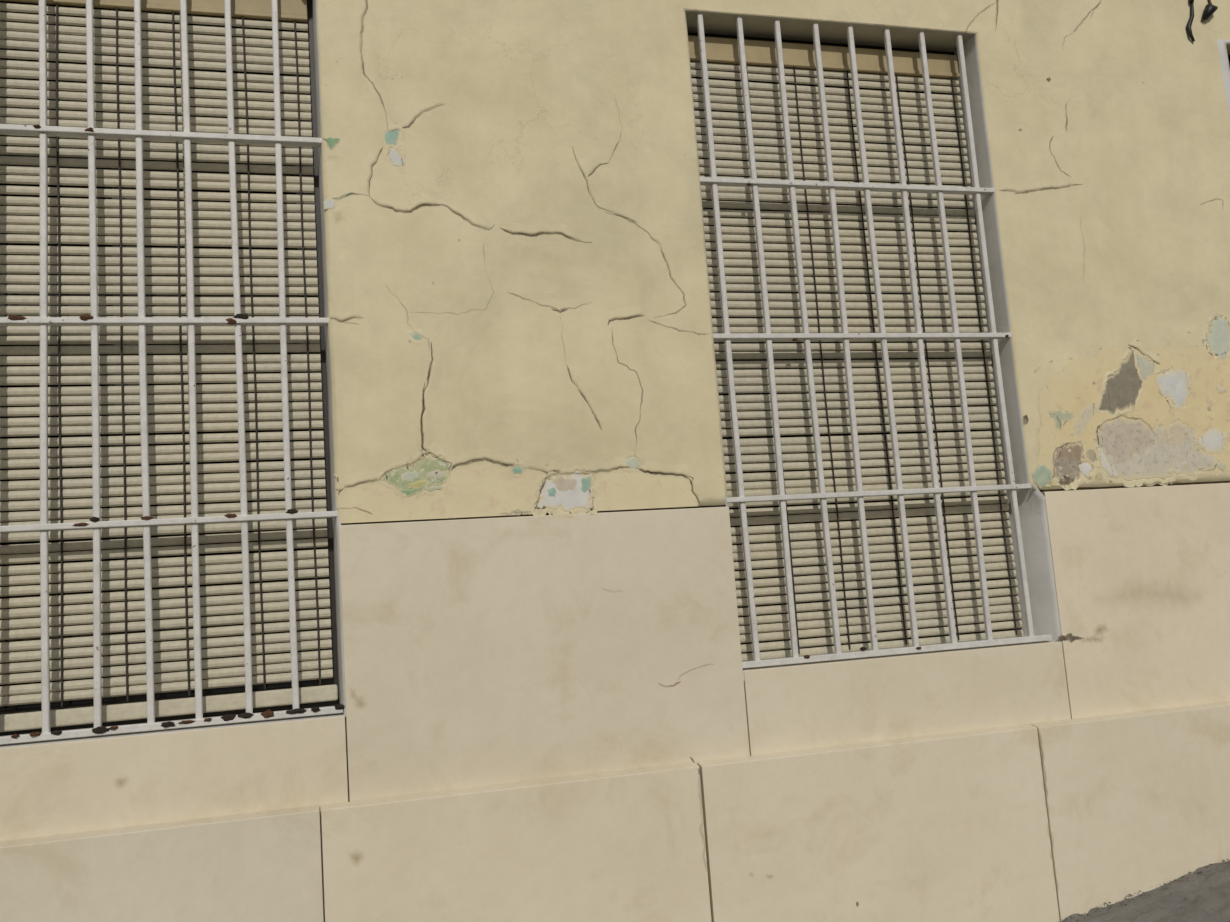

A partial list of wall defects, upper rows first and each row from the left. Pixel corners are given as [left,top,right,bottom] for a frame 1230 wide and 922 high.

crack [357,149,583,242]
rust [226,314,249,325]
crack [607,305,644,324]
crack [421,343,451,463]
flaking render [338,448,704,523]
rust [161,704,345,727]
rust [11,730,63,738]
rust [92,726,118,734]